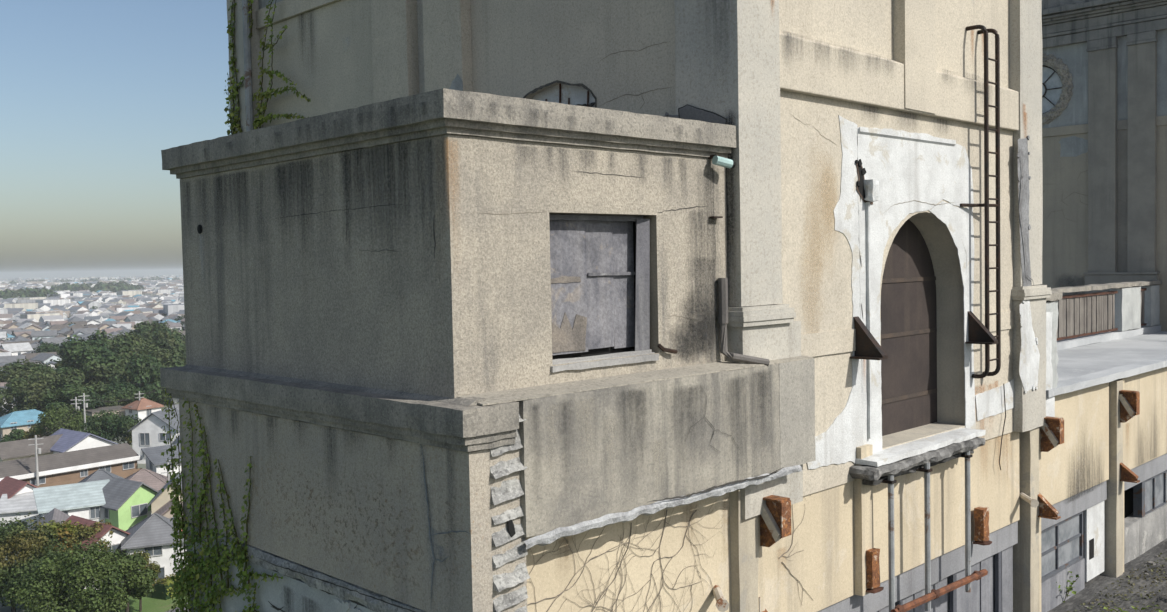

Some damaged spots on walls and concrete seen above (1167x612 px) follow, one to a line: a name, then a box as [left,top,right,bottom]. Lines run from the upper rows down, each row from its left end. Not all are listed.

spalling [855,159,873,205]
leakage [675,296,716,359]
crack [261,444,470,612]
spalling [490,401,802,612]